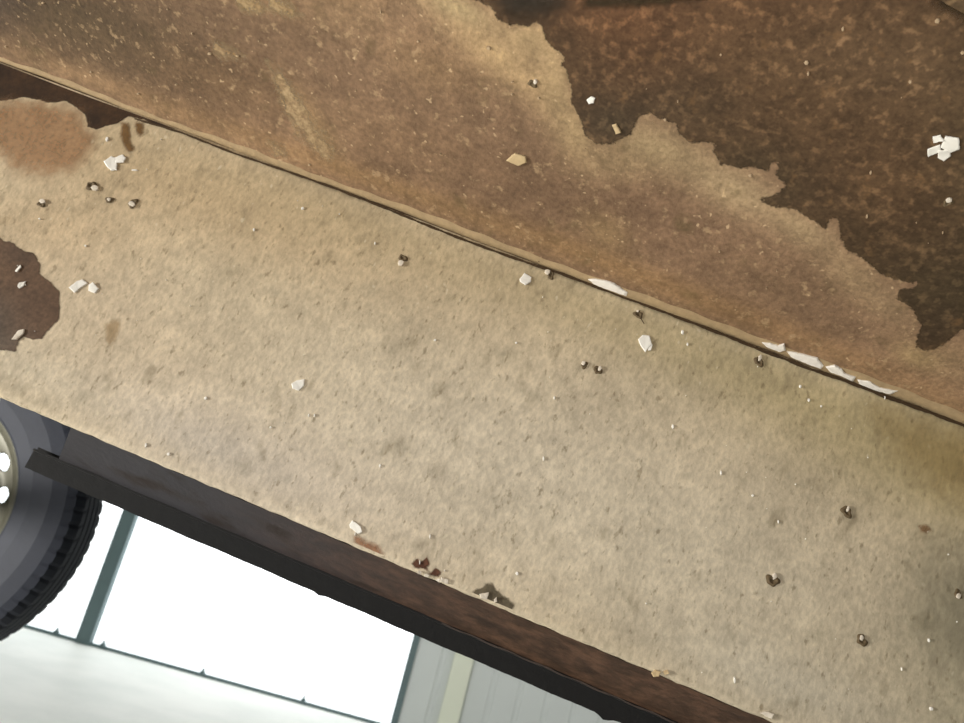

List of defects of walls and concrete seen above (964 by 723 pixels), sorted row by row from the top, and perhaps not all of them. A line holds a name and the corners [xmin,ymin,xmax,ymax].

water stain [0,63,174,152]
peeling [927,135,960,161]
peeling [638,335,653,352]
peeling [787,351,897,394]